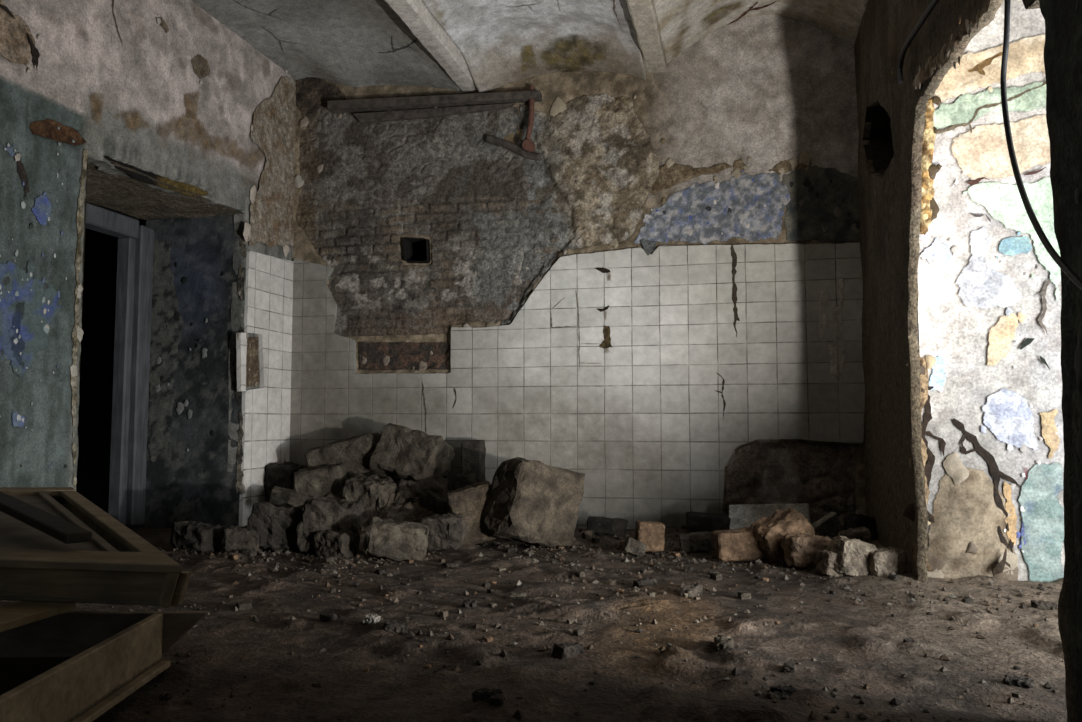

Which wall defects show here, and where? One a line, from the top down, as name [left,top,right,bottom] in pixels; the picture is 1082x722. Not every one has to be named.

flaking render [0,0,41,73]
crack [112,0,123,45]
crack [234,0,299,51]
peeling [4,143,57,229]
spalling [863,104,894,177]
flaking render [912,0,1061,369]
peeling [0,238,61,377]
flaking render [49,126,89,490]
peeling [147,238,208,462]
flaking render [221,70,860,494]
crack [731,245,740,337]
peeling [0,412,27,428]